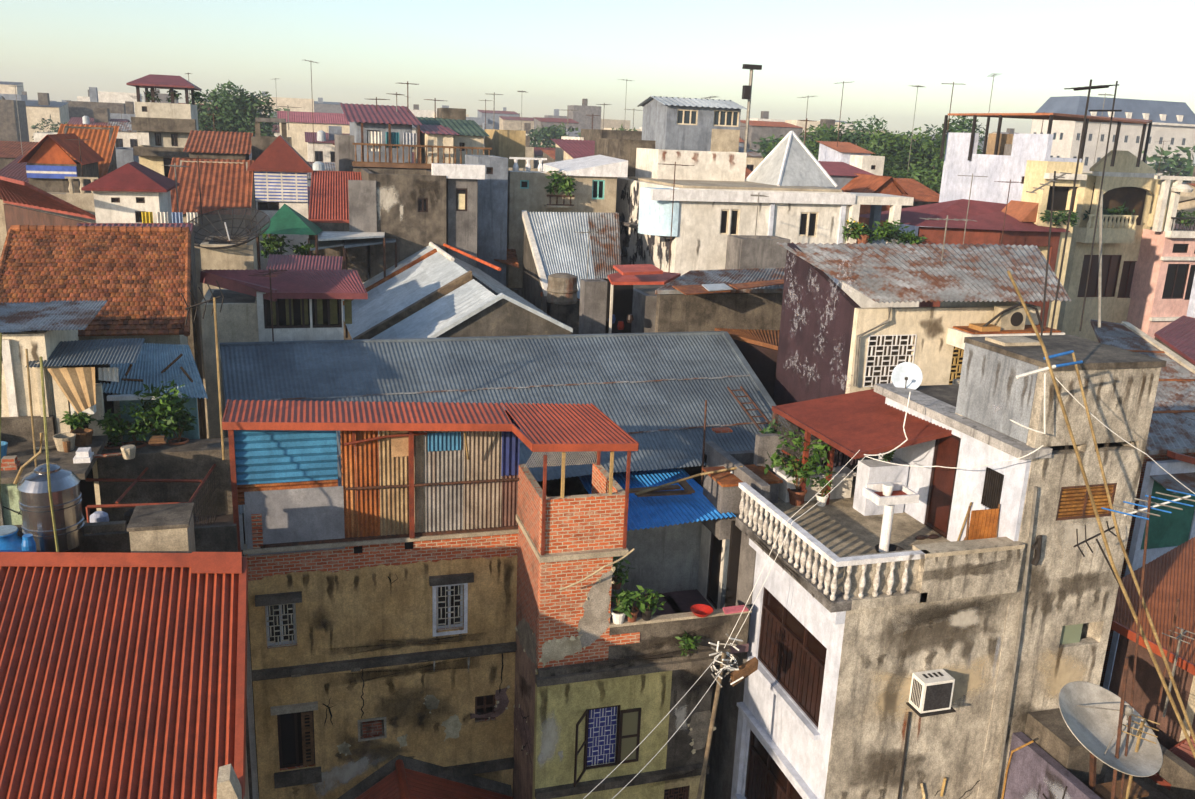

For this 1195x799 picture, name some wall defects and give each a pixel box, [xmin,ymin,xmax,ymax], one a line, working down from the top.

damp [1049,379,1103,404]
damp [1067,523,1100,554]
damp [489,561,512,594]
damp [910,552,993,579]
damp [366,631,462,651]
damp [867,599,998,715]
crack [323,669,365,726]
damp [349,659,469,729]
damp [842,754,923,799]